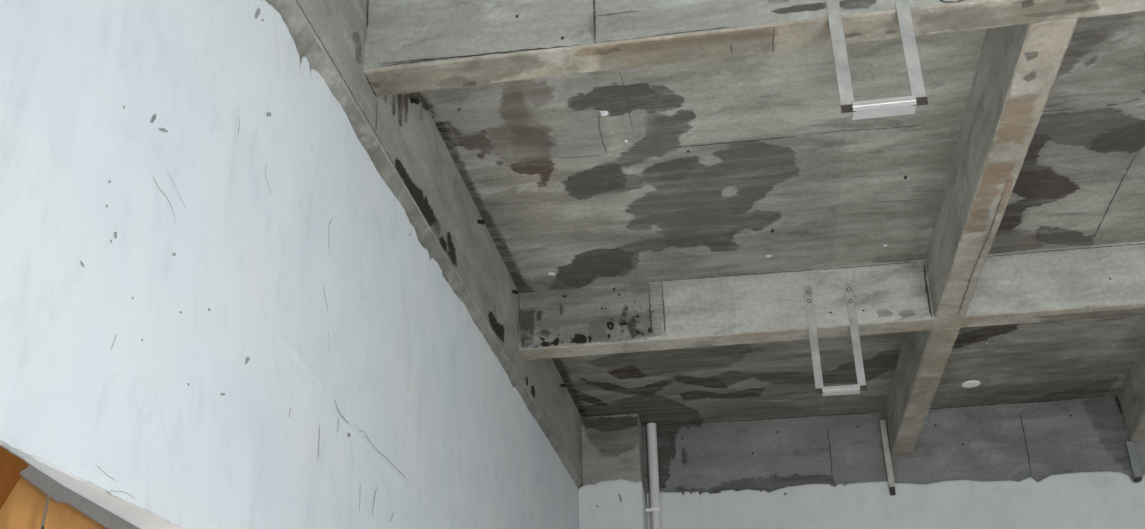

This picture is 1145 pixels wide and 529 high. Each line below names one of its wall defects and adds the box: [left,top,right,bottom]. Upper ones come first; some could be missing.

water stain [375,68,534,293]
water stain [551,83,798,339]
water stain [489,312,505,342]
water stain [519,310,592,347]
water stain [553,351,899,494]